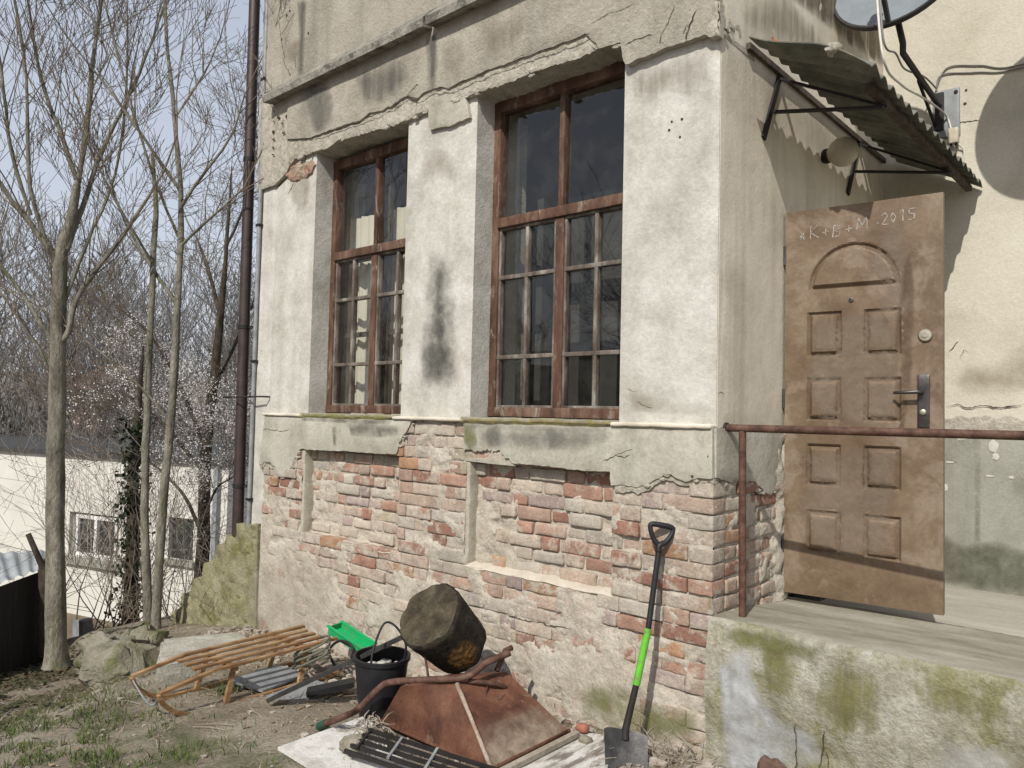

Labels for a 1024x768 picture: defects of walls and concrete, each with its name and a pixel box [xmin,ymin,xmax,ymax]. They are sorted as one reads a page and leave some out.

crack [625,2,720,45]
spalling [272,36,622,181]
crack [313,4,632,137]
water stain [429,283,446,373]
crack [951,402,1024,410]
spalling [262,451,303,519]
spalling [398,420,474,513]
spalling [611,474,726,615]
water stain [721,656,812,768]